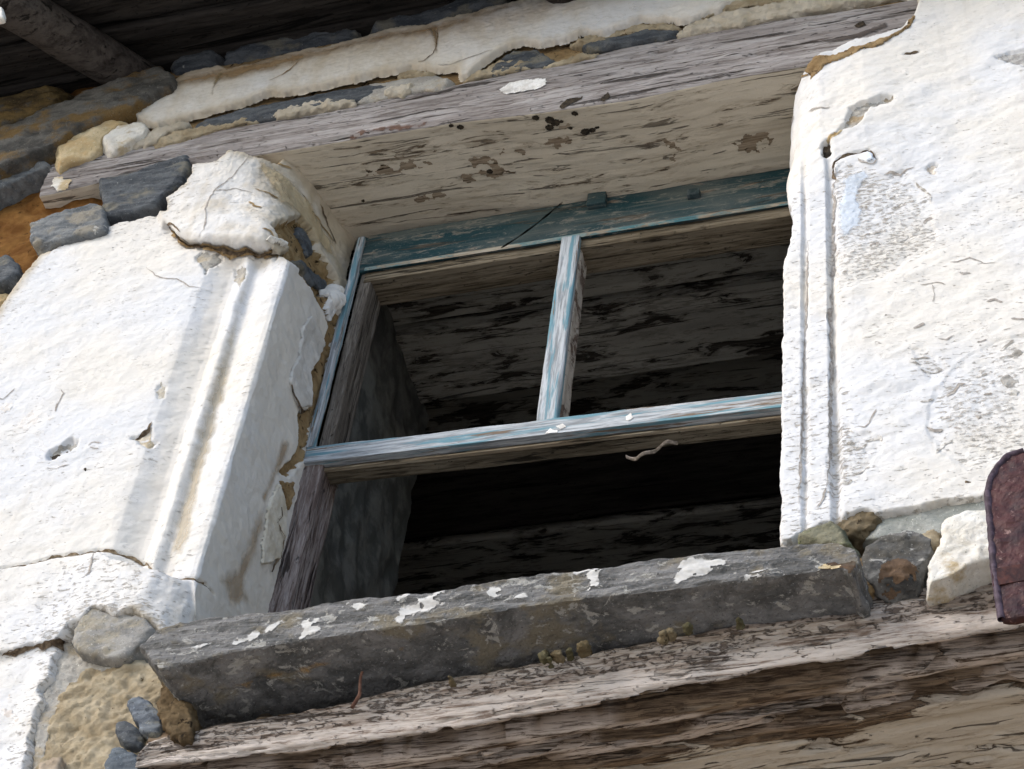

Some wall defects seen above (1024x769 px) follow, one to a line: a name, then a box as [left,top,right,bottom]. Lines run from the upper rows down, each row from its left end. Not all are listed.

peeling [500,78,547,94]
spalling [797,15,915,89]
spalling [821,96,893,159]
crack [167,155,278,260]
spalling [260,219,346,572]
spalling [135,422,155,449]
crack [11,549,152,578]
crack [2,639,65,657]
spalling [33,642,111,769]
spalling [104,696,165,769]